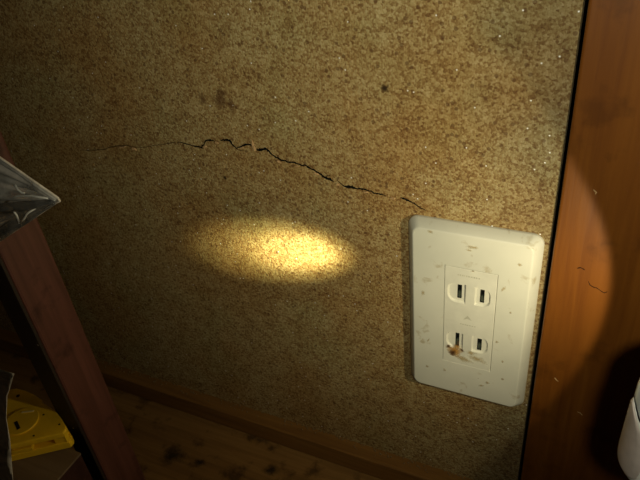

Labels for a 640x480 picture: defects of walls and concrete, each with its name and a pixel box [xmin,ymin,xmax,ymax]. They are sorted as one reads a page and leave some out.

crack [86,139,425,210]